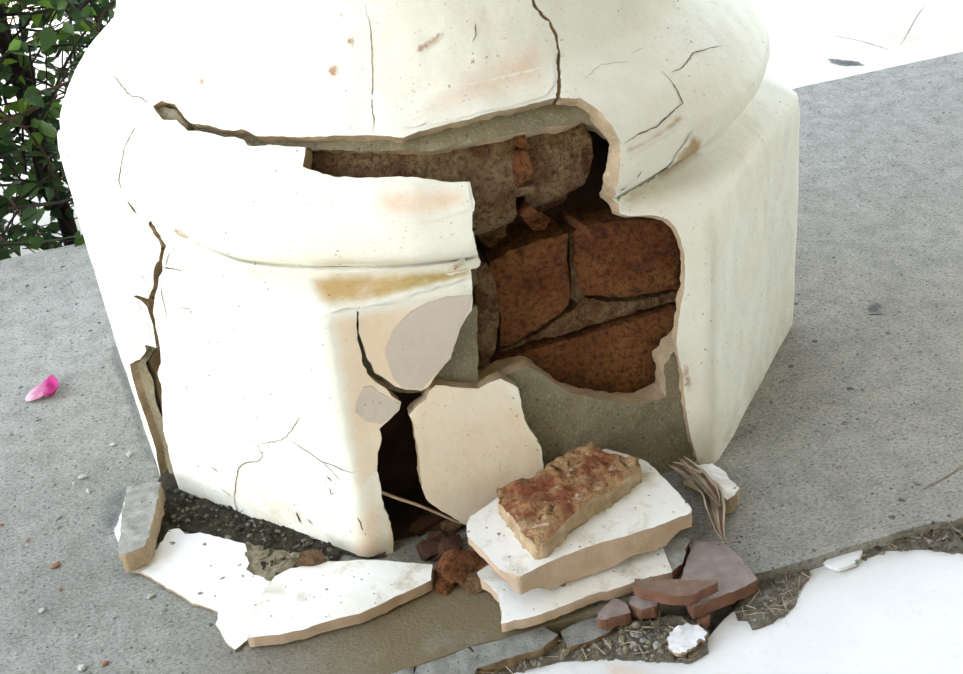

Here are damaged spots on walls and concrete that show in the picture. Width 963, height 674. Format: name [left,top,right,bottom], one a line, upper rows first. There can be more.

crack [365,4,375,131]
crack [532,0,561,100]
spalling [311,123,696,474]
spalling [137,345,174,474]
crack [222,420,356,509]